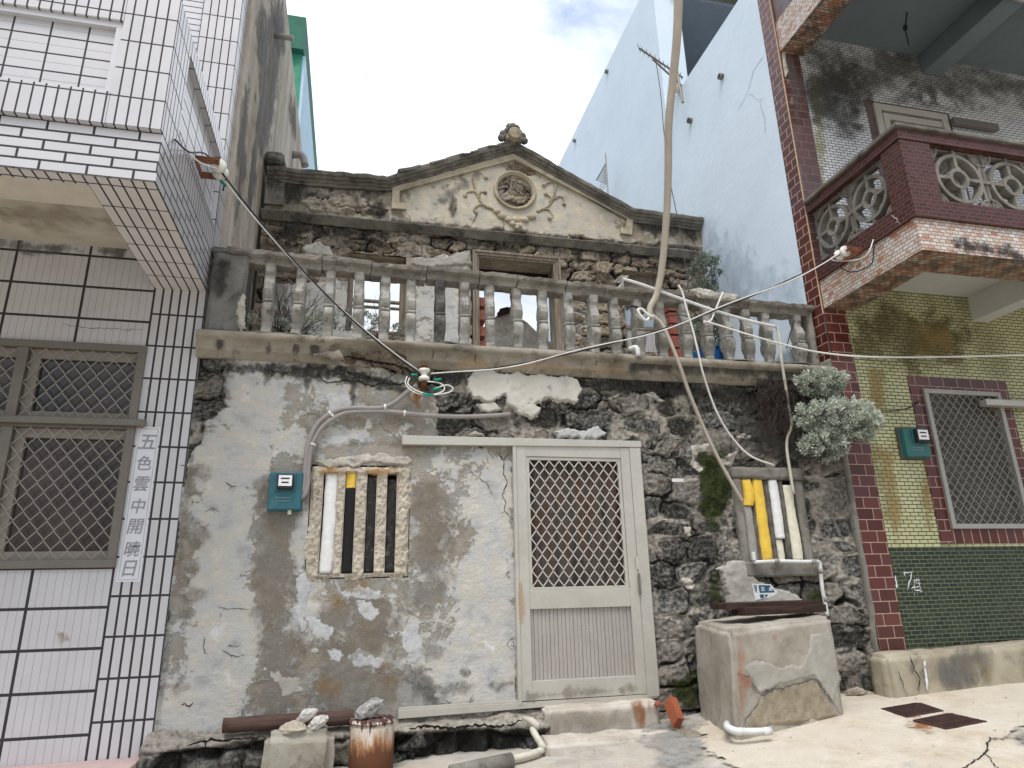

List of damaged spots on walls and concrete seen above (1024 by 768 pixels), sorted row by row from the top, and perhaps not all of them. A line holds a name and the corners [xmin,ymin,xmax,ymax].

damp [236,0,285,216]
damp [808,70,870,134]
peeling [316,388,354,411]
peeling [466,370,582,420]
spalling [315,433,413,468]
crack [468,452,513,519]
peeling [293,570,385,669]
peeling [390,619,423,665]
peeling [263,667,304,697]
spalling [746,680,837,728]
crack [962,736,999,768]